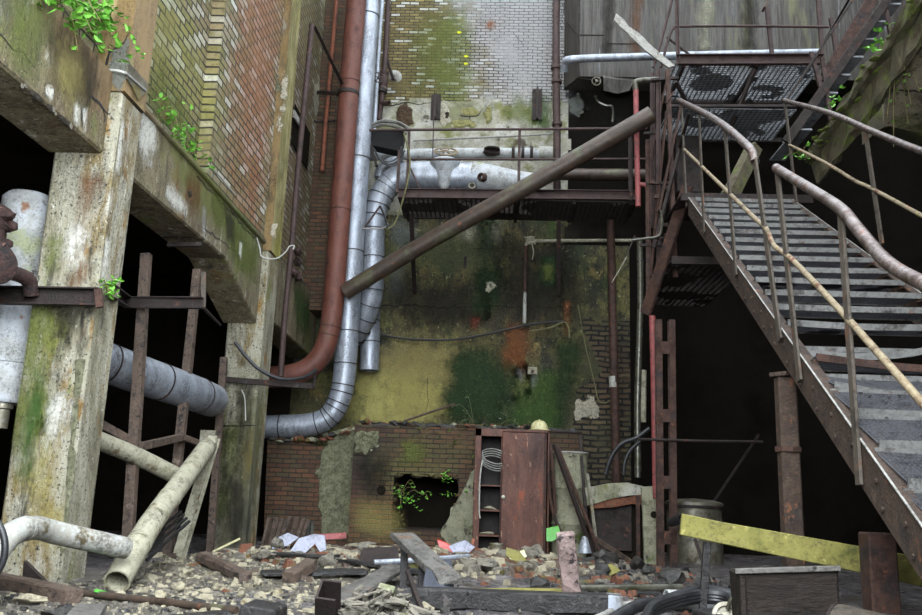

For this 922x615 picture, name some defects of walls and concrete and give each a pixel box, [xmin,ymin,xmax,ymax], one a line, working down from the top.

efflorescence [166,188,184,212]
leakage [226,212,242,257]
spalling [574,395,600,421]
flaking render [315,427,379,536]
flaking render [389,470,474,545]